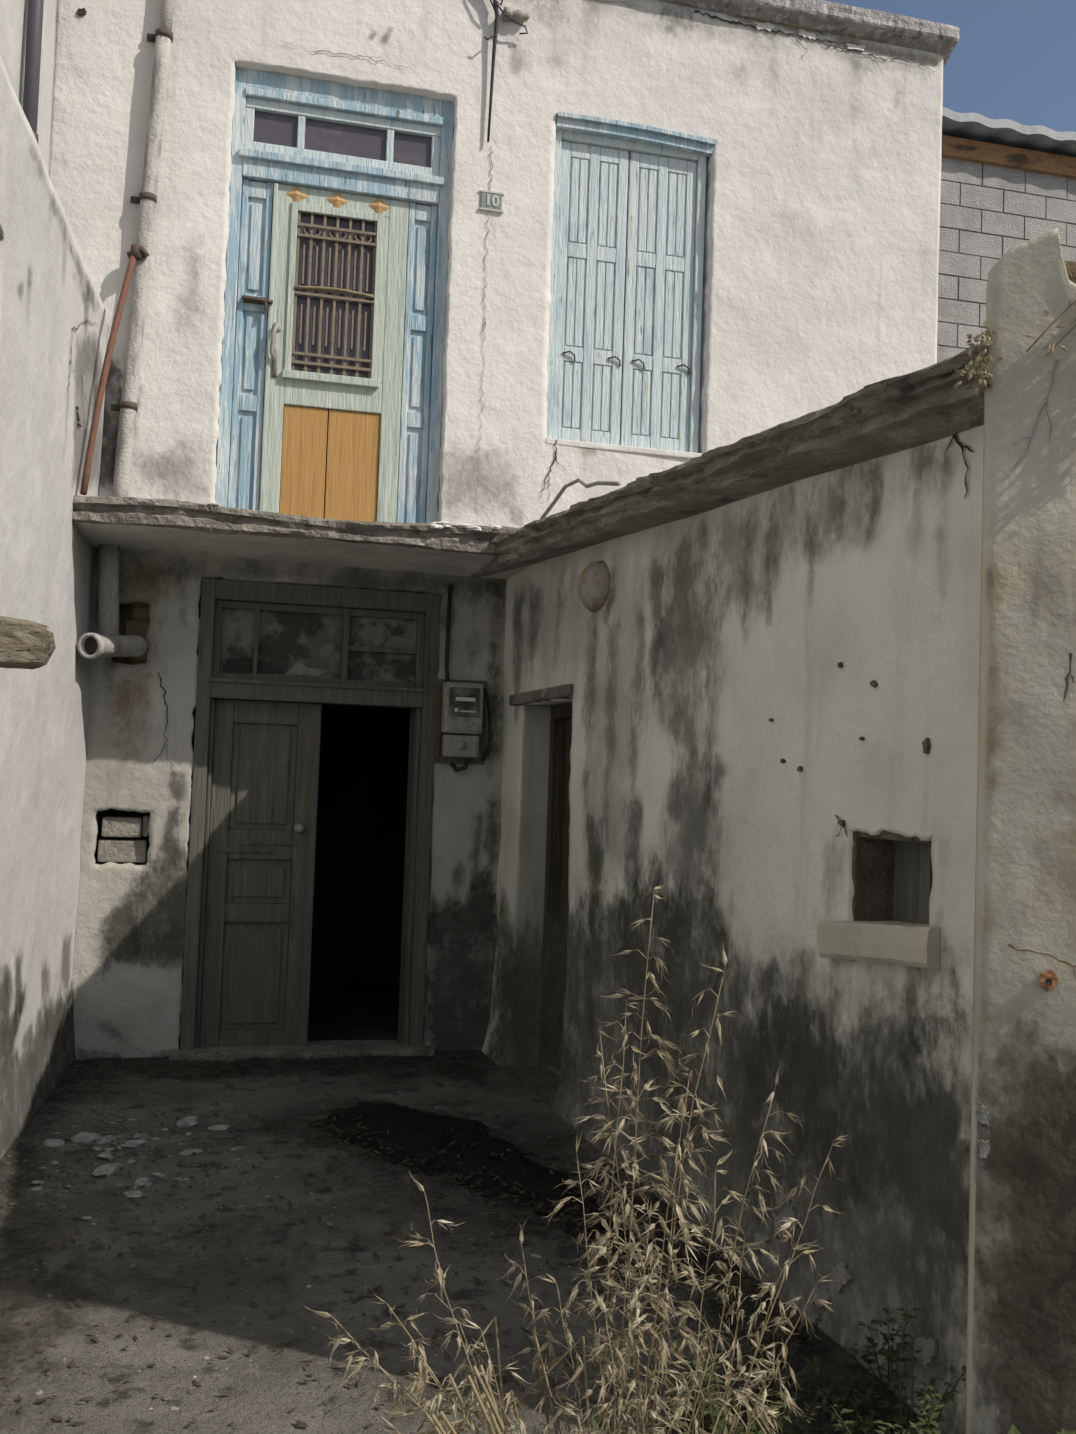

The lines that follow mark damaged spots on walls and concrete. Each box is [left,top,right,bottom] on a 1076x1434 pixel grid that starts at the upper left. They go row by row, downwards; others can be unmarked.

crack [279,43,412,70]
crack [475,148,496,506]
crack [540,439,565,500]
crack [944,434,974,499]
crack [1011,359,1059,470]
leakage [659,527,711,669]
crack [153,672,175,778]
leakage [103,781,187,967]
rust [1040,970,1058,992]
leakage [0,959,76,1162]
leakage [424,694,1076,1434]